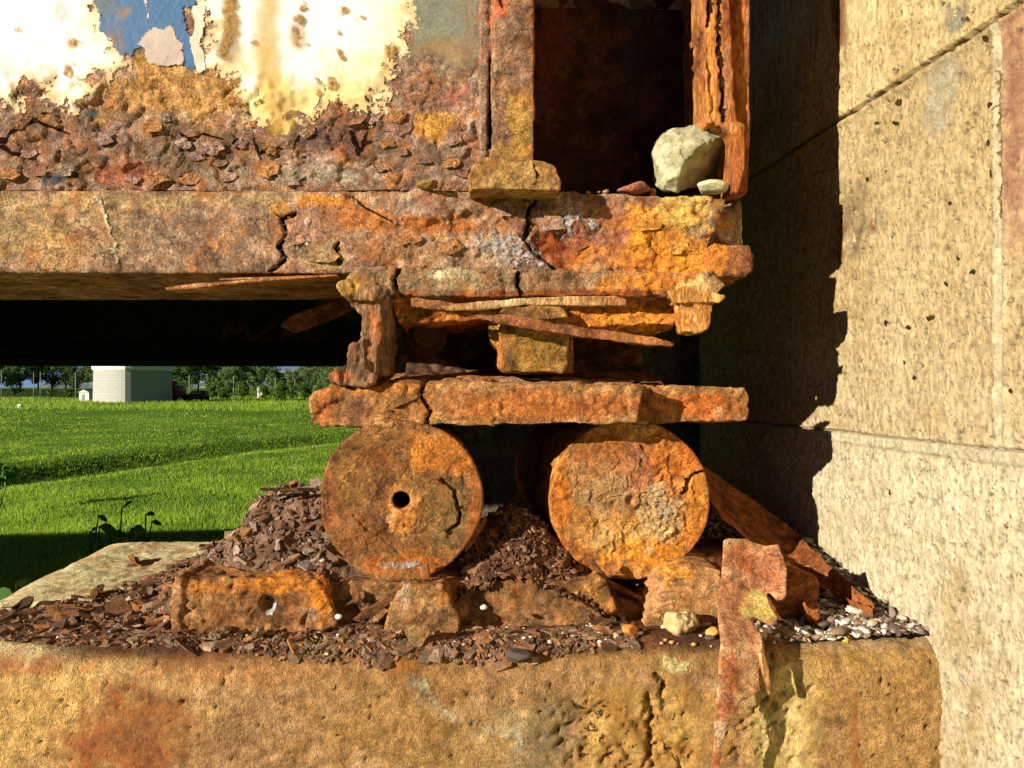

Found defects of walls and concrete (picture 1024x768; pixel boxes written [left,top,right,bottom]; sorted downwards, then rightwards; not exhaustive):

peeling [0,0,479,186]
corrosion [251,0,291,130]
corrosion [315,77,338,96]
crack [268,211,296,272]
crack [515,163,556,295]
corrosion [69,692,181,768]